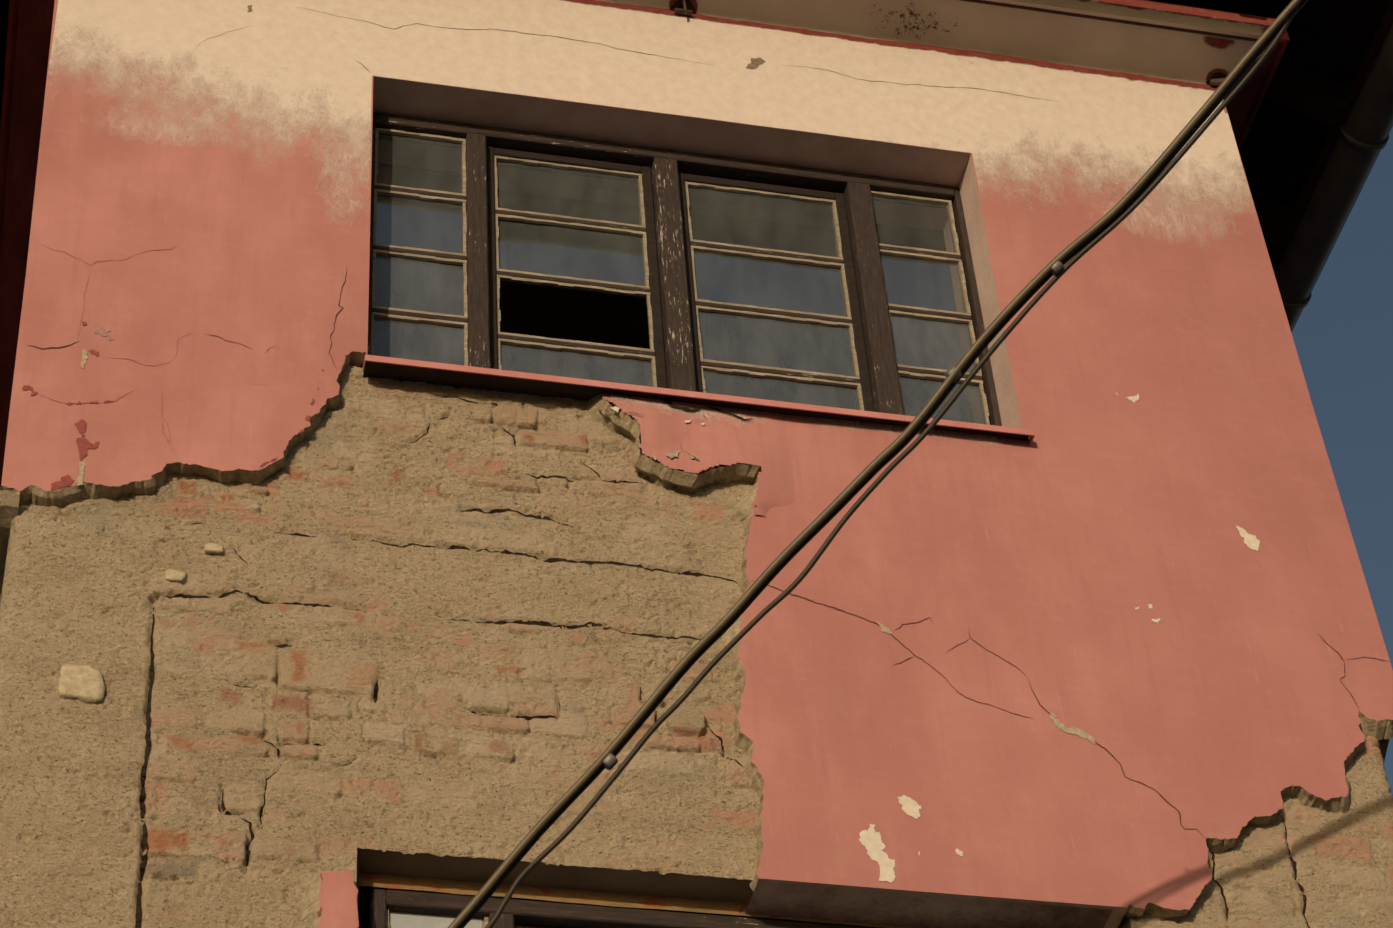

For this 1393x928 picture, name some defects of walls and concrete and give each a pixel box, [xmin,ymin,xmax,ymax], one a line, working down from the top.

damp [49,0,1251,232]
crack [28,242,276,453]
crack [329,267,347,367]
peeling [1236,526,1260,551]
crack [135,548,356,928]
spalling [0,351,764,928]
peeling [859,824,896,883]
peeling [897,795,921,819]
crack [1095,741,1229,919]
spalling [1118,711,1393,928]
crack [1281,815,1310,928]
crack [1318,634,1386,708]